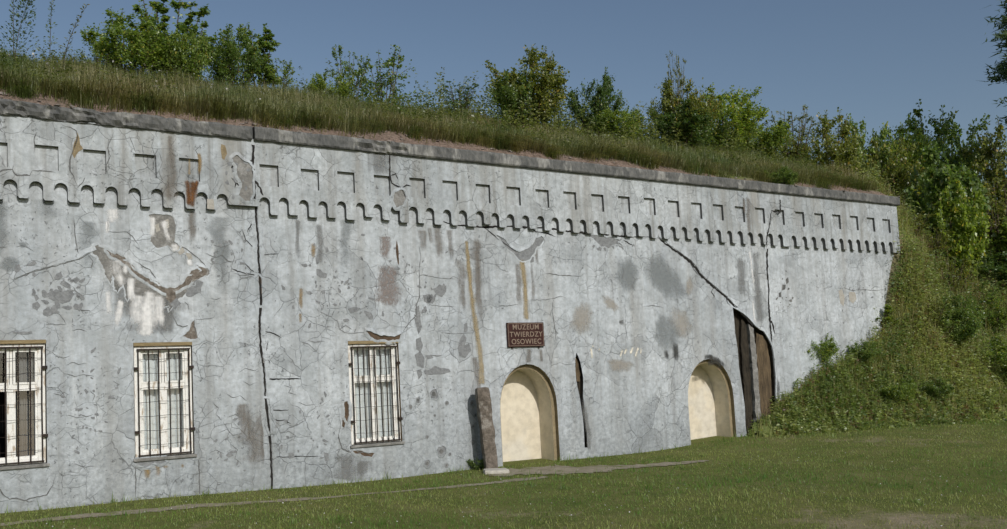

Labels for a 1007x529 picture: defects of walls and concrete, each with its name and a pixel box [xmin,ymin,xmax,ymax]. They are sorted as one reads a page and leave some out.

corrosion [186,154,201,206]
crack [389,154,412,197]
peeling [15,260,90,325]
crack [0,223,156,283]
spalling [89,210,276,313]
spalling [179,317,201,343]
crack [195,145,371,490]
water stain [462,242,484,383]
crack [429,200,781,342]
water stain [620,261,635,287]
water stain [652,263,691,293]
water stain [657,315,687,359]